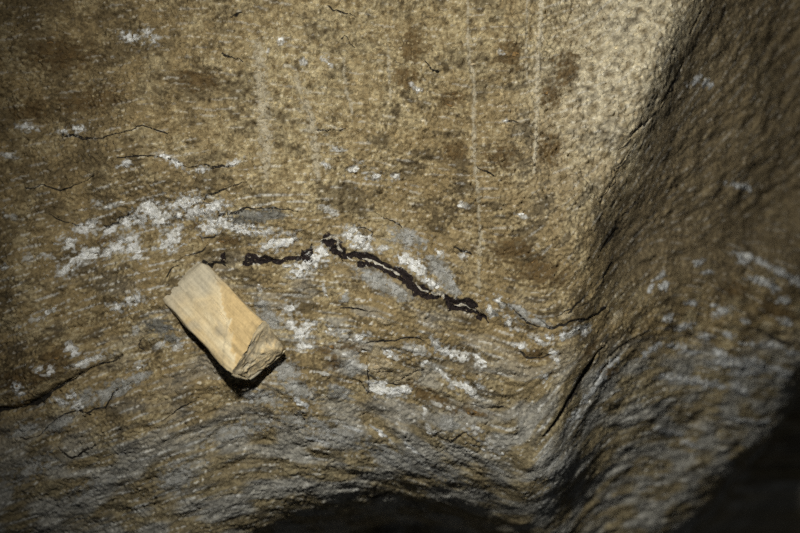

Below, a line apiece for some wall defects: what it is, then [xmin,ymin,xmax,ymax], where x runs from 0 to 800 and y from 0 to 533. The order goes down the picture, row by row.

crack [62,125,169,140]
efflorescence [22,193,298,280]
efflorescence [283,243,329,279]
crack [117,155,640,329]
crack [366,335,424,343]
crack [0,355,122,412]
crack [543,330,650,436]